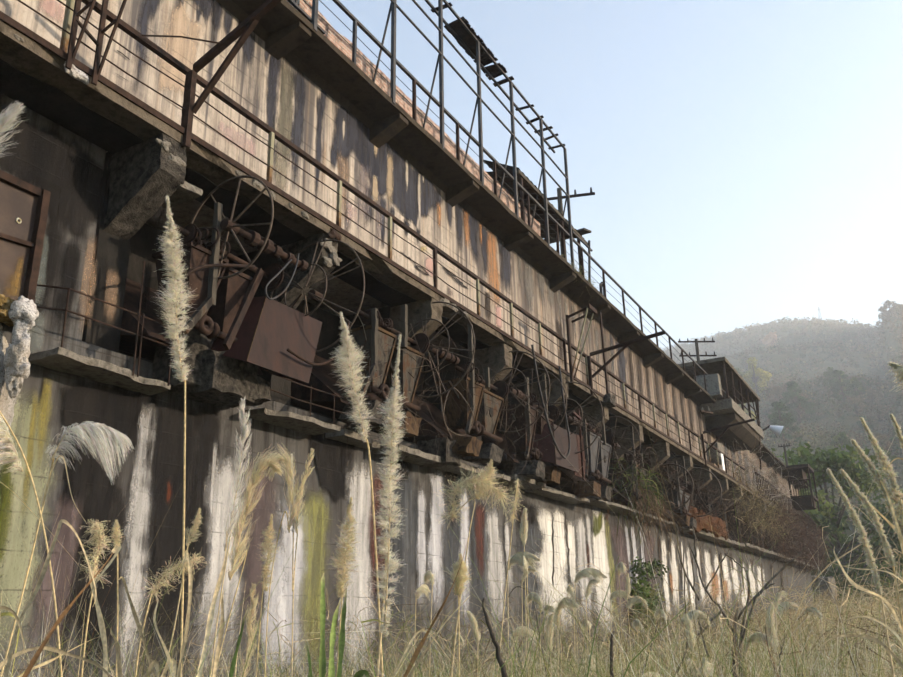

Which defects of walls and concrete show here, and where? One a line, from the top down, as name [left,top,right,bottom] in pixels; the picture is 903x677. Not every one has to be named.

water stain [136,0,161,87]
water stain [179,0,242,35]
water stain [243,34,306,185]
water stain [0,100,110,346]
corrosion [480,223,500,301]
water stain [316,90,764,497]
water stain [0,381,785,676]
crack [551,509,570,586]